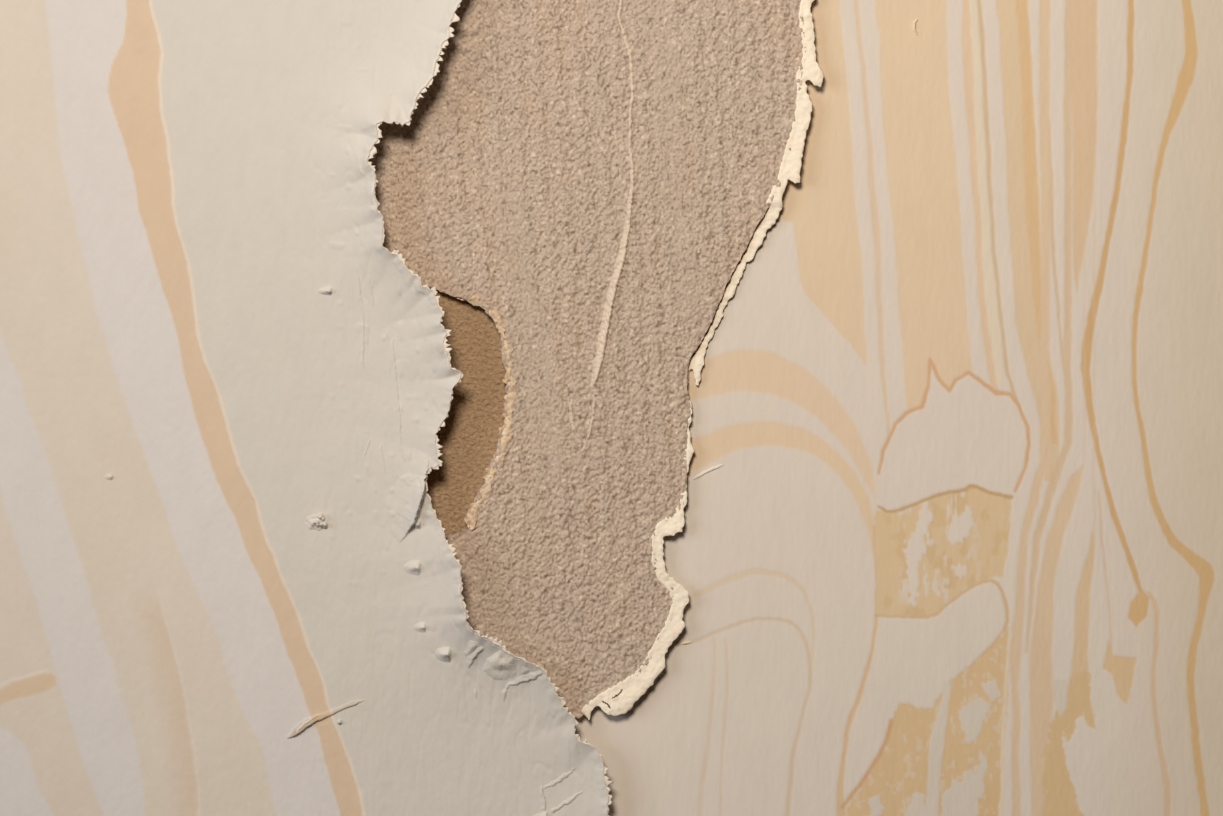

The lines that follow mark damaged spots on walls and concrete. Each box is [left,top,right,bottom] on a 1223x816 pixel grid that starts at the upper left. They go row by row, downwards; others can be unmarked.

spalling [464,640,543,702]